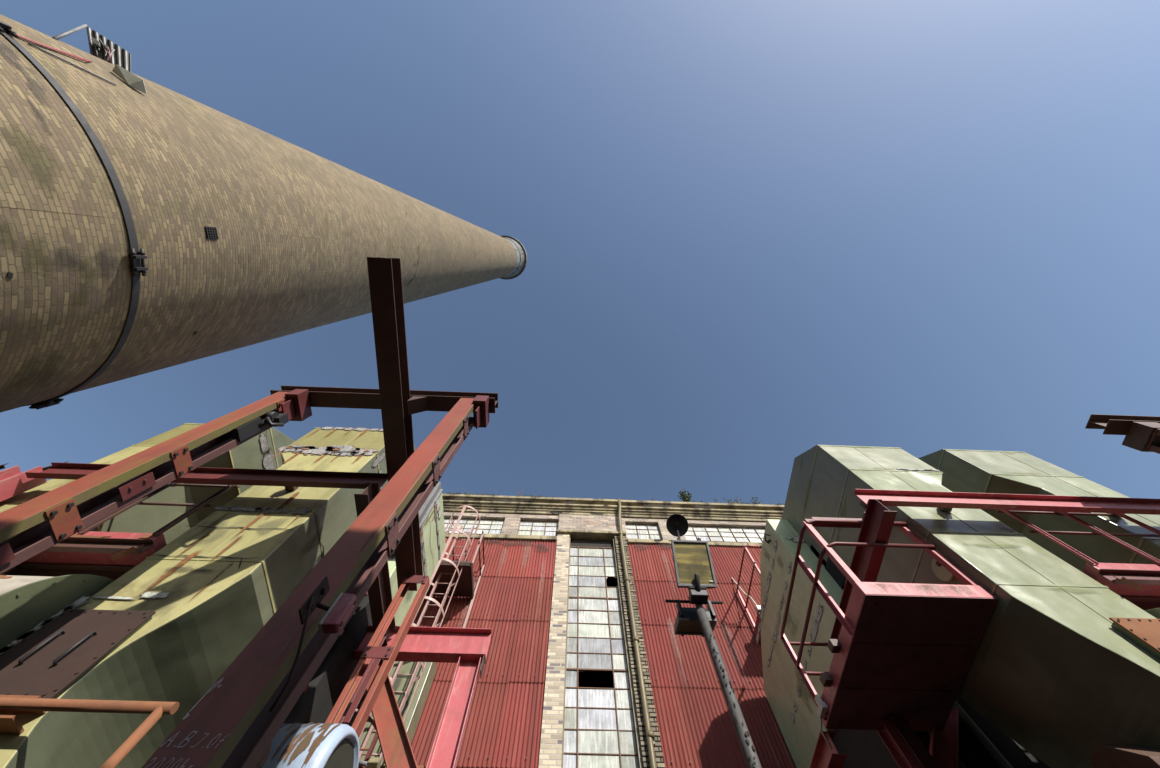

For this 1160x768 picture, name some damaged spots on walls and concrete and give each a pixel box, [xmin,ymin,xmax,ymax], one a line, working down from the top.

peeling [259,427,386,490]
rust [141,529,214,594]
rust [194,536,242,597]